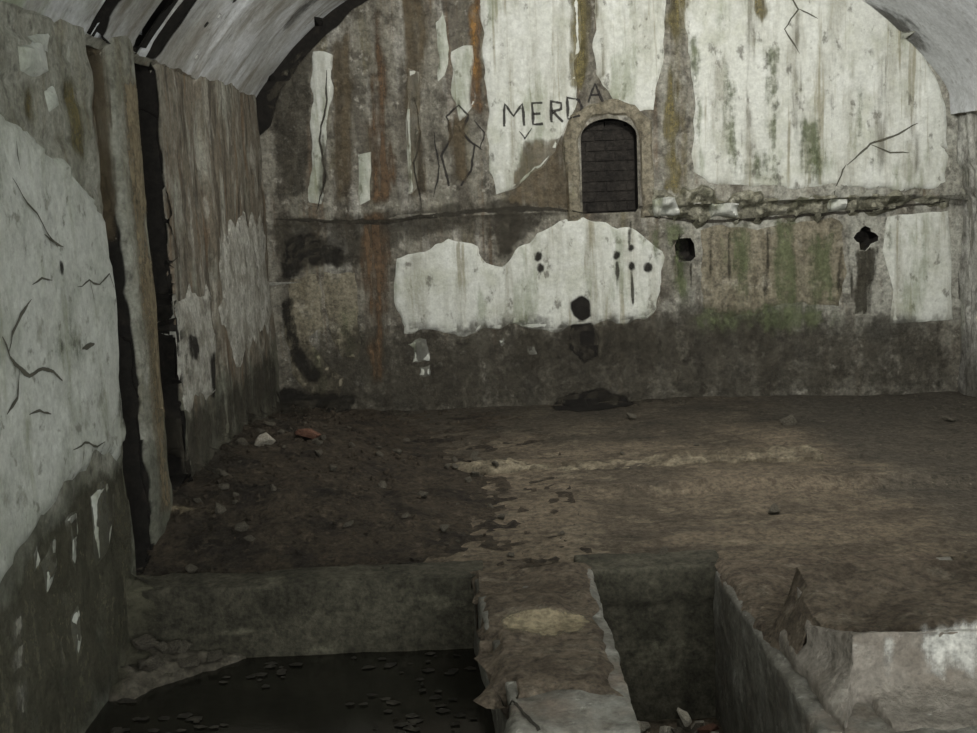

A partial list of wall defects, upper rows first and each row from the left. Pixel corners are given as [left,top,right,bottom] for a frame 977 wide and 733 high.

water stain [87,0,121,44]
crack [13,141,63,247]
water stain [64,81,84,156]
flaking render [308,51,334,204]
flaking render [358,152,371,205]
crack [276,70,587,224]
water stain [124,0,944,510]
flaking render [394,0,680,375]
crack [645,123,946,223]
crack [2,277,63,415]
water stain [0,177,155,733]
water stain [923,624,977,675]